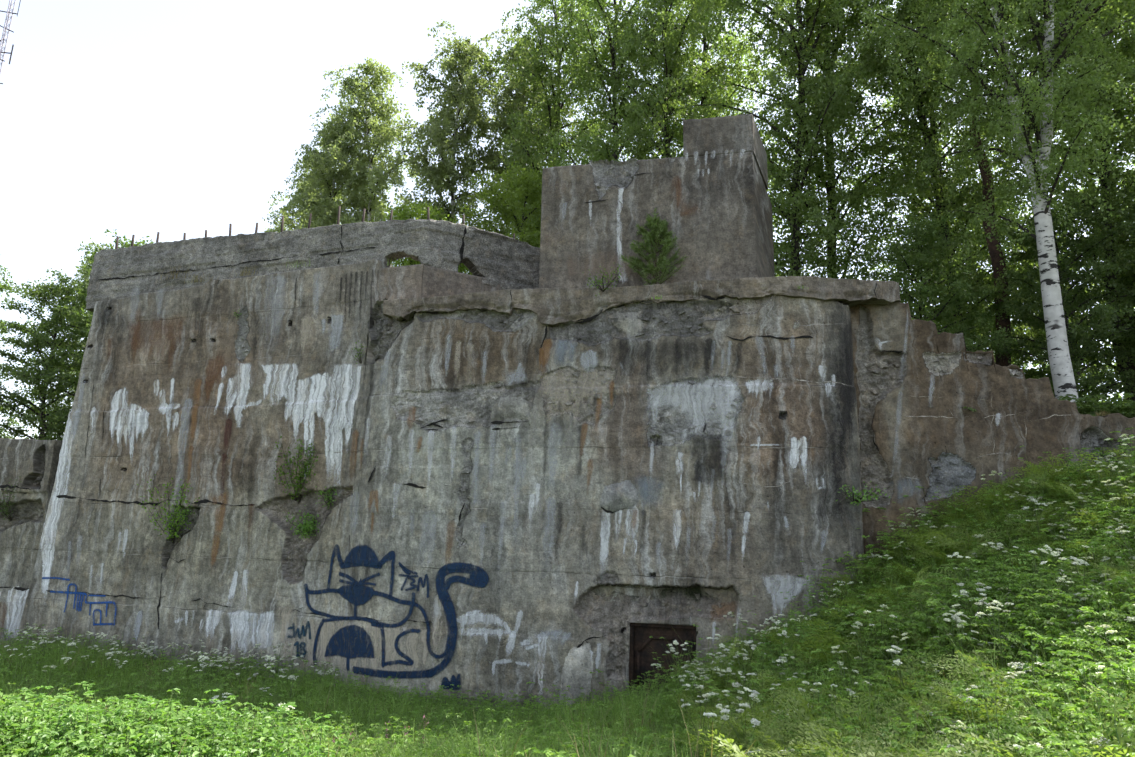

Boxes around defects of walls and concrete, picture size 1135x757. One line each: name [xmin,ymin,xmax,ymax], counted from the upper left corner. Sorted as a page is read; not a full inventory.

spalling [0,444,46,532]
damp [40,387,96,594]
crack [0,384,256,506]
damp [110,379,180,458]
corrosion [211,419,232,563]
damp [216,363,361,474]
spalling [363,300,528,366]
spalling [390,365,617,549]
spalling [838,301,907,508]
spalling [923,351,992,376]
damp [0,586,29,638]
crack [0,557,185,630]